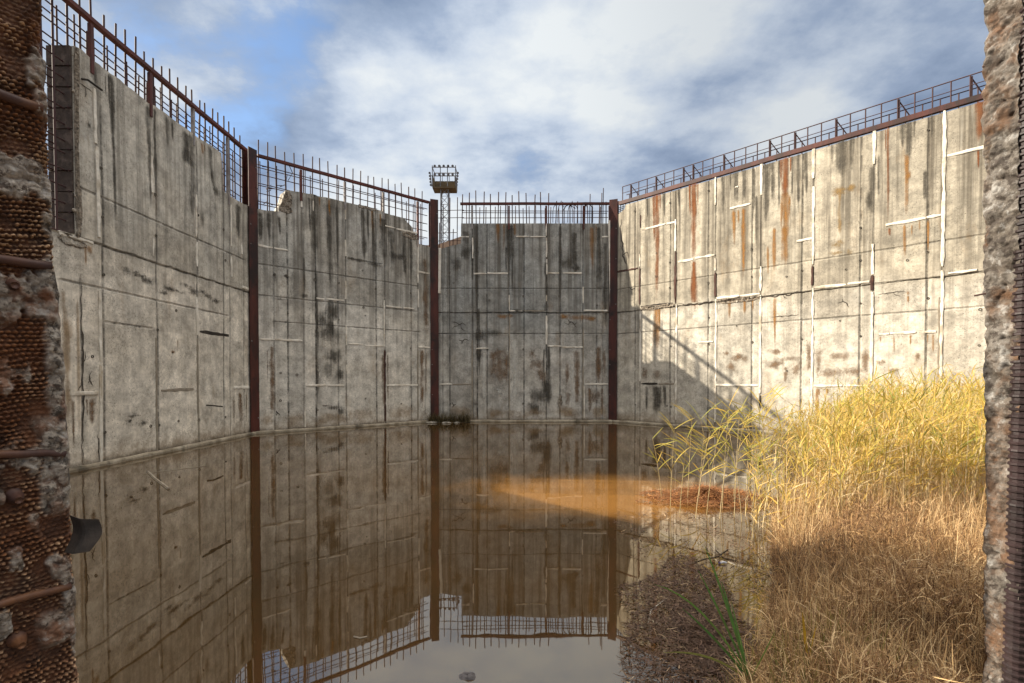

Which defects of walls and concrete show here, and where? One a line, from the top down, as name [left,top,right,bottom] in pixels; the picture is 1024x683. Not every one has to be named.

damp [146,107,194,196]
damp [309,200,338,282]
spalling [257,140,626,248]
damp [544,227,579,295]
rust [653,194,661,284]
rust [689,183,698,303]
rust [732,209,745,268]
rust [767,157,791,267]
damp [837,138,854,170]
damp [867,157,879,206]
rust [975,102,983,136]
damp [302,260,343,389]